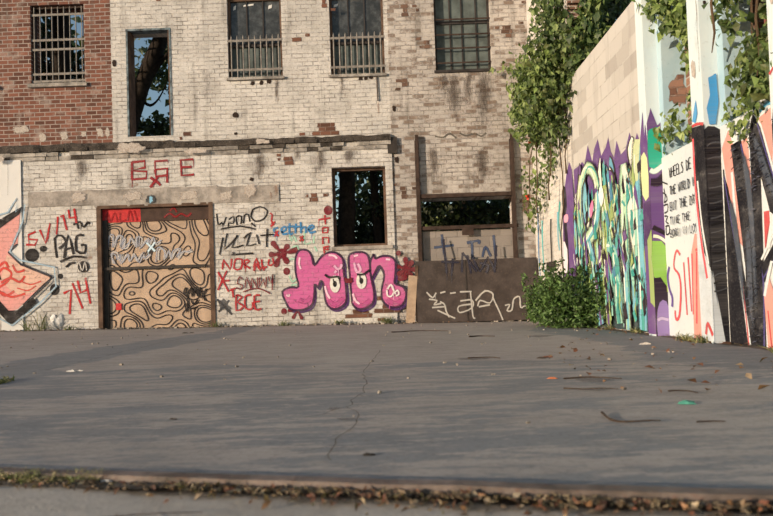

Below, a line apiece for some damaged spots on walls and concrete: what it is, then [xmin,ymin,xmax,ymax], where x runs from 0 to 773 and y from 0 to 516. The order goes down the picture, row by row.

flaking render [668,60,695,107]